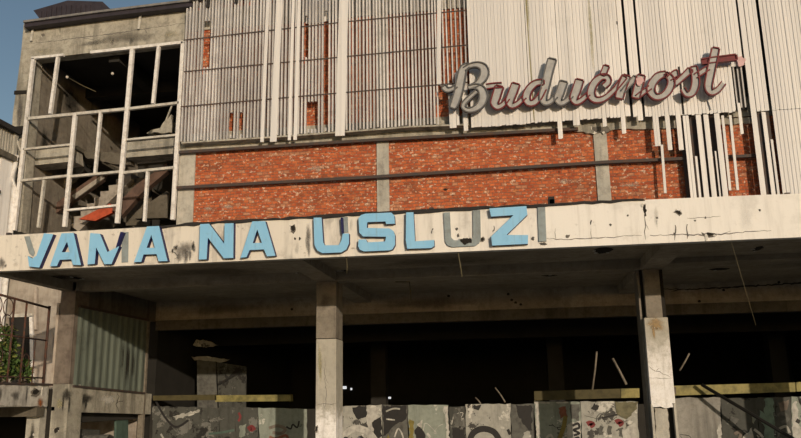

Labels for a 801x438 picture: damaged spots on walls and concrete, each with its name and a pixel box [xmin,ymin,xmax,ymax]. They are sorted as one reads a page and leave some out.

crack [547,215,771,240]
leakage [172,242,195,261]
crack [667,282,801,292]